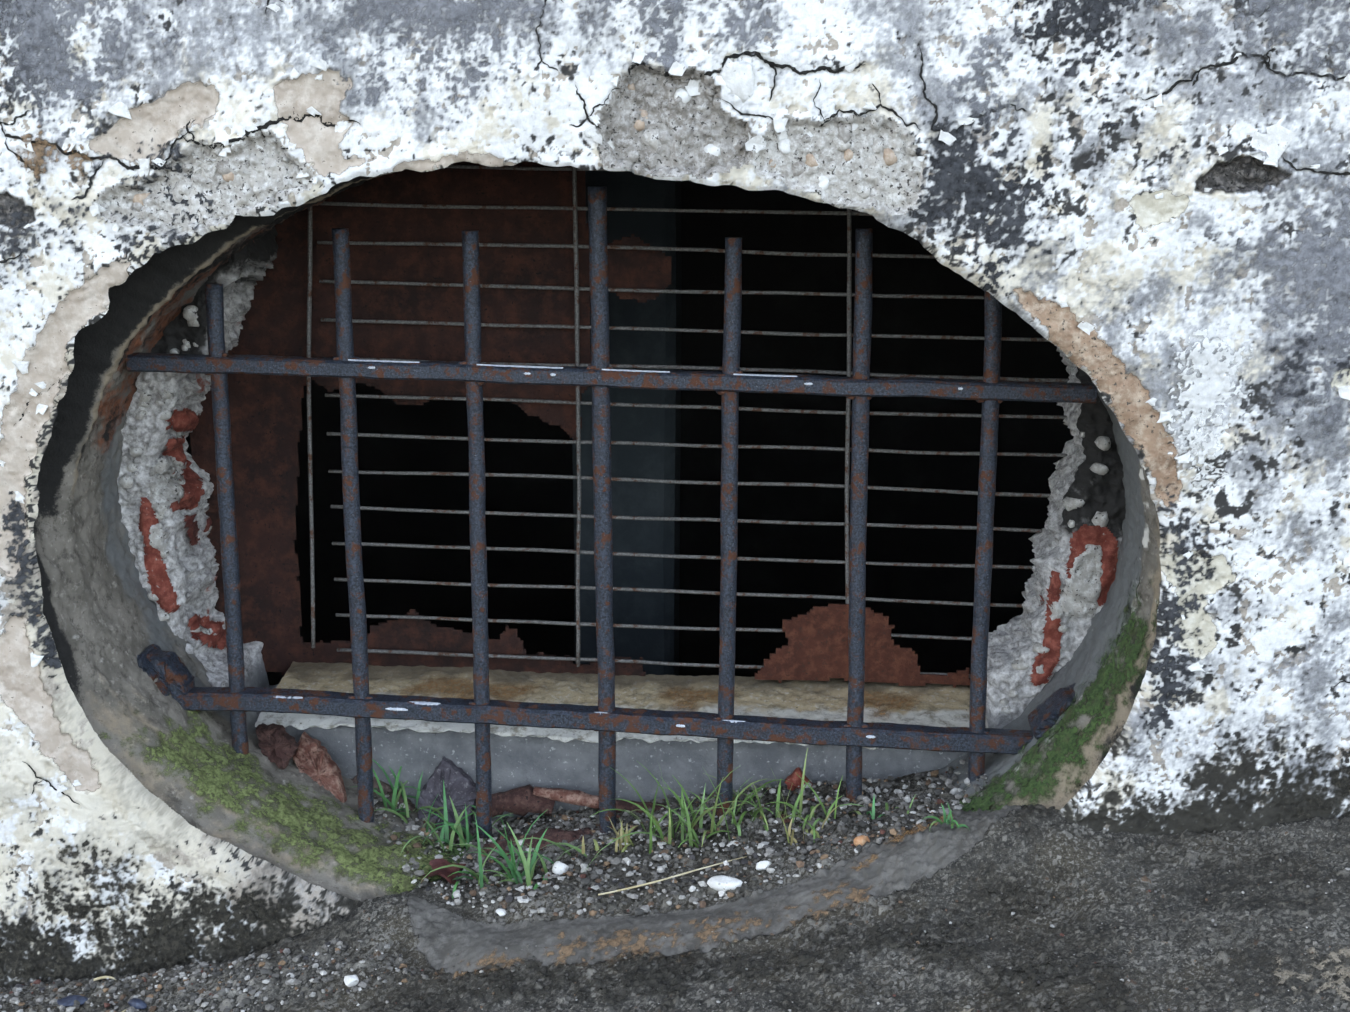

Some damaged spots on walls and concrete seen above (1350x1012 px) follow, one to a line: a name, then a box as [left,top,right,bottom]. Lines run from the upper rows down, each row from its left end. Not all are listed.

crack [0,106,360,200]
spalling [62,59,370,242]
spalling [583,58,927,215]
crack [528,0,1026,152]
spalling [1122,124,1296,232]
crack [1142,48,1350,107]
crack [1282,155,1350,176]
peeling [1013,287,1192,507]
flaking render [138,408,227,650]
corrosion [864,692,914,717]
leakage [1279,749,1350,822]
leakage [0,835,315,990]